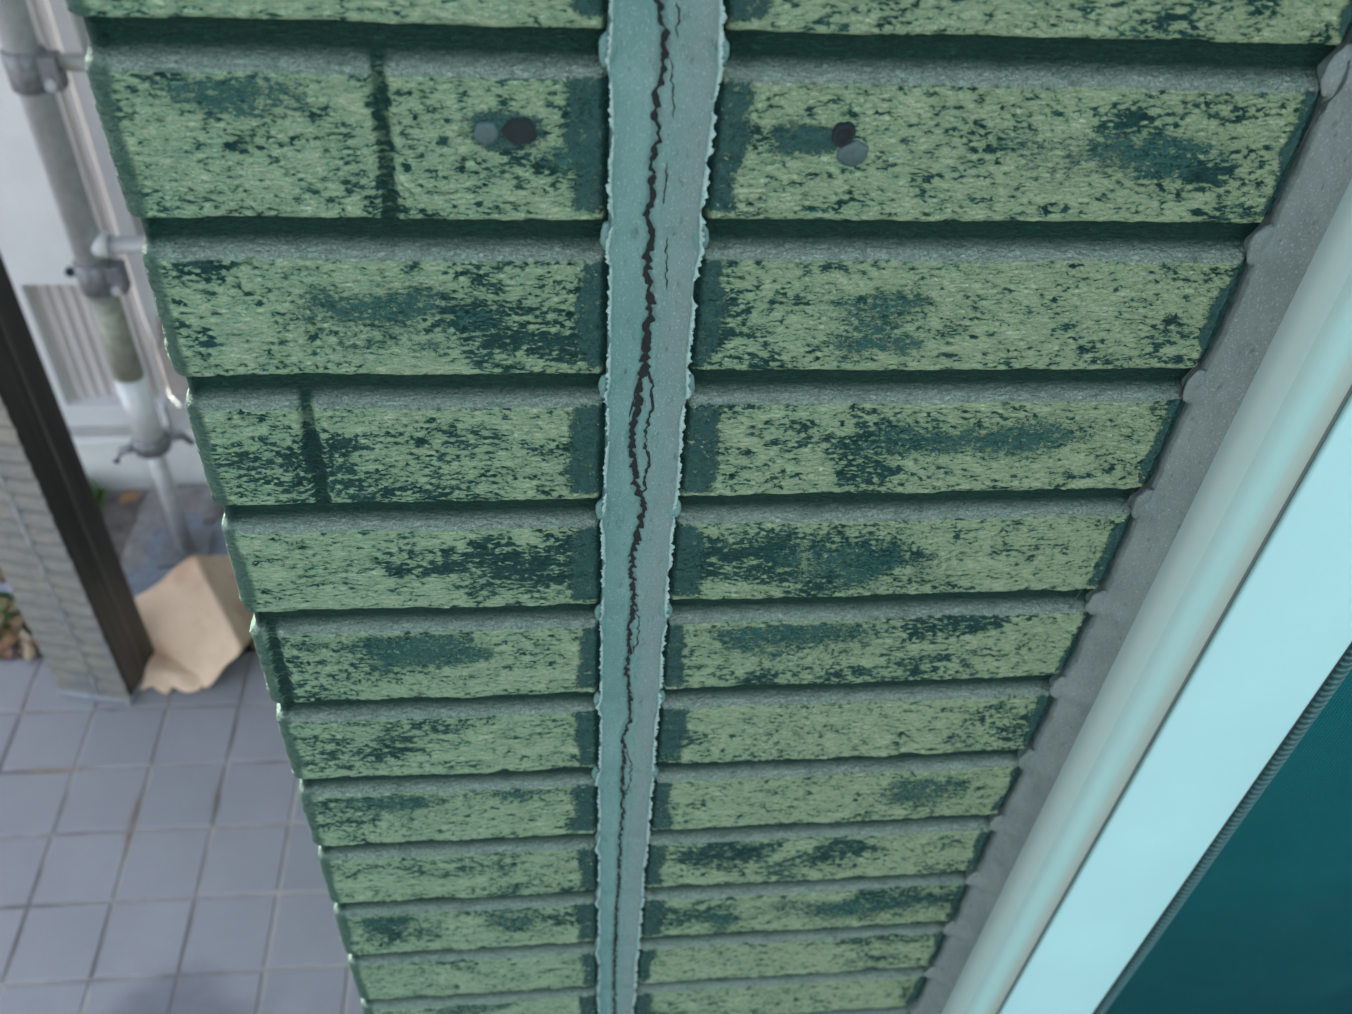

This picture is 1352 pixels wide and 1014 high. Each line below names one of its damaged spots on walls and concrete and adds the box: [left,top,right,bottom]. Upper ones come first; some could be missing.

crack [612,0,680,1014]